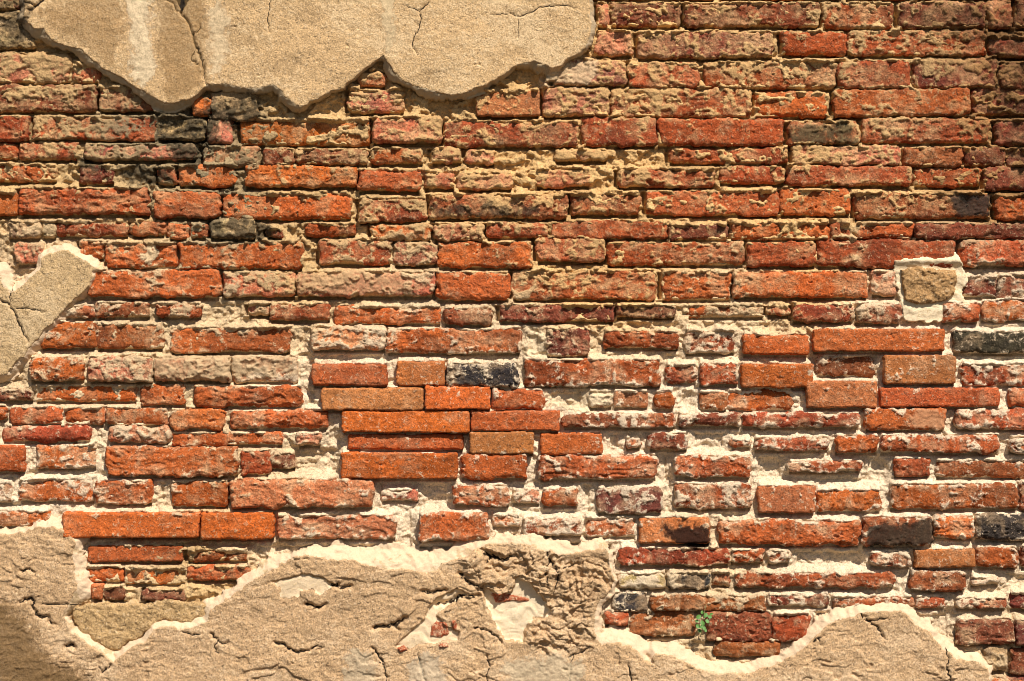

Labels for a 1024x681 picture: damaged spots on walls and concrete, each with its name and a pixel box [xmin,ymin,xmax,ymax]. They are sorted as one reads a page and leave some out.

crack [167,0,207,85]
peeling [16,0,597,114]
peeling [0,243,101,383]
crack [19,597,81,624]
crack [305,581,351,609]
crack [422,551,515,605]
peeling [0,516,993,681]
crack [545,551,574,592]
crack [183,632,228,653]
crack [275,642,322,653]
crack [372,618,404,681]
crack [474,627,502,681]